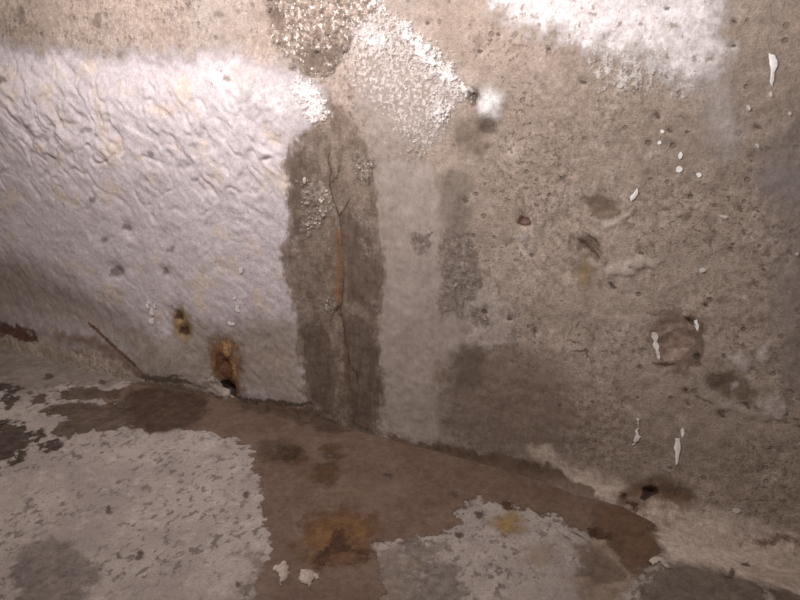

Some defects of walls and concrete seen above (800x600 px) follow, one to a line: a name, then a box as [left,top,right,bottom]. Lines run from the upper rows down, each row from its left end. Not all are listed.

crack [324,151,350,248]
corrosion [173,306,191,340]
corrosion [210,337,244,399]
damp [26,0,664,600]
crack [330,274,360,416]
spalling [643,307,771,421]
corrosion [302,509,377,569]